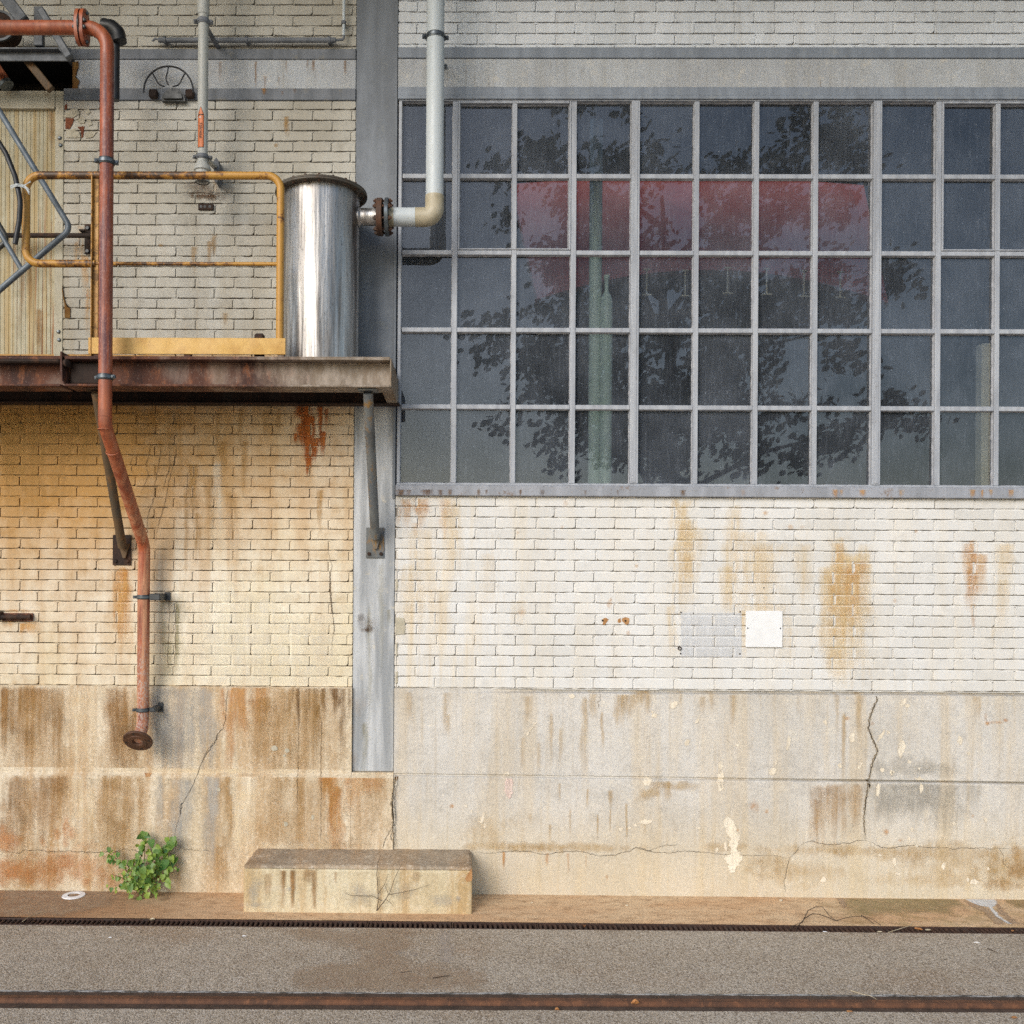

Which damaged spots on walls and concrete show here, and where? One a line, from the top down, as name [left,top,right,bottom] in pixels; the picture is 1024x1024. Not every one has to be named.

corrosion [294,406,328,472]
corrosion [222,688,266,717]
corrosion [314,689,338,719]
corrosion [320,777,340,833]
crack [383,774,397,846]
crack [487,692,1005,886]
spalling [715,817,742,873]
corrosion [0,860,117,916]